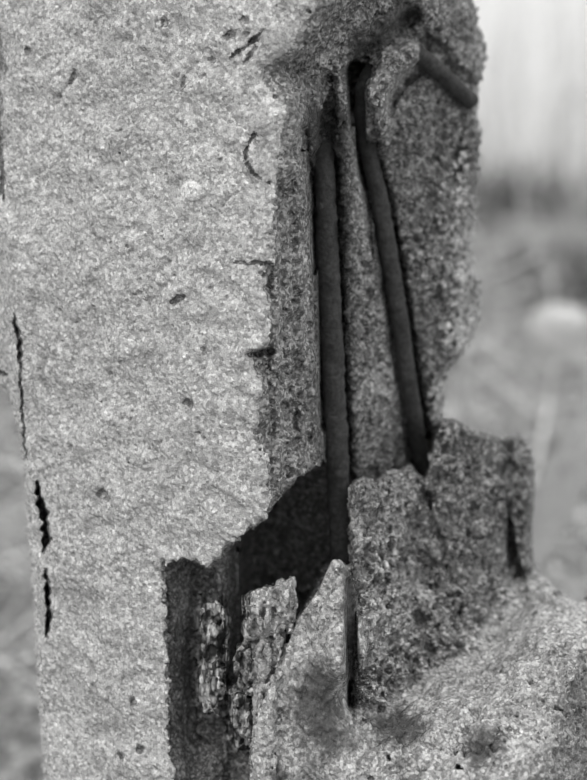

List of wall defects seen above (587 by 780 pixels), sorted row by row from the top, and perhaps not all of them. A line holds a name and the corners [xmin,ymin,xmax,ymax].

crack [0,108,8,202]
crack [0,312,28,458]
spalling [161,0,587,780]
crack [34,480,53,639]